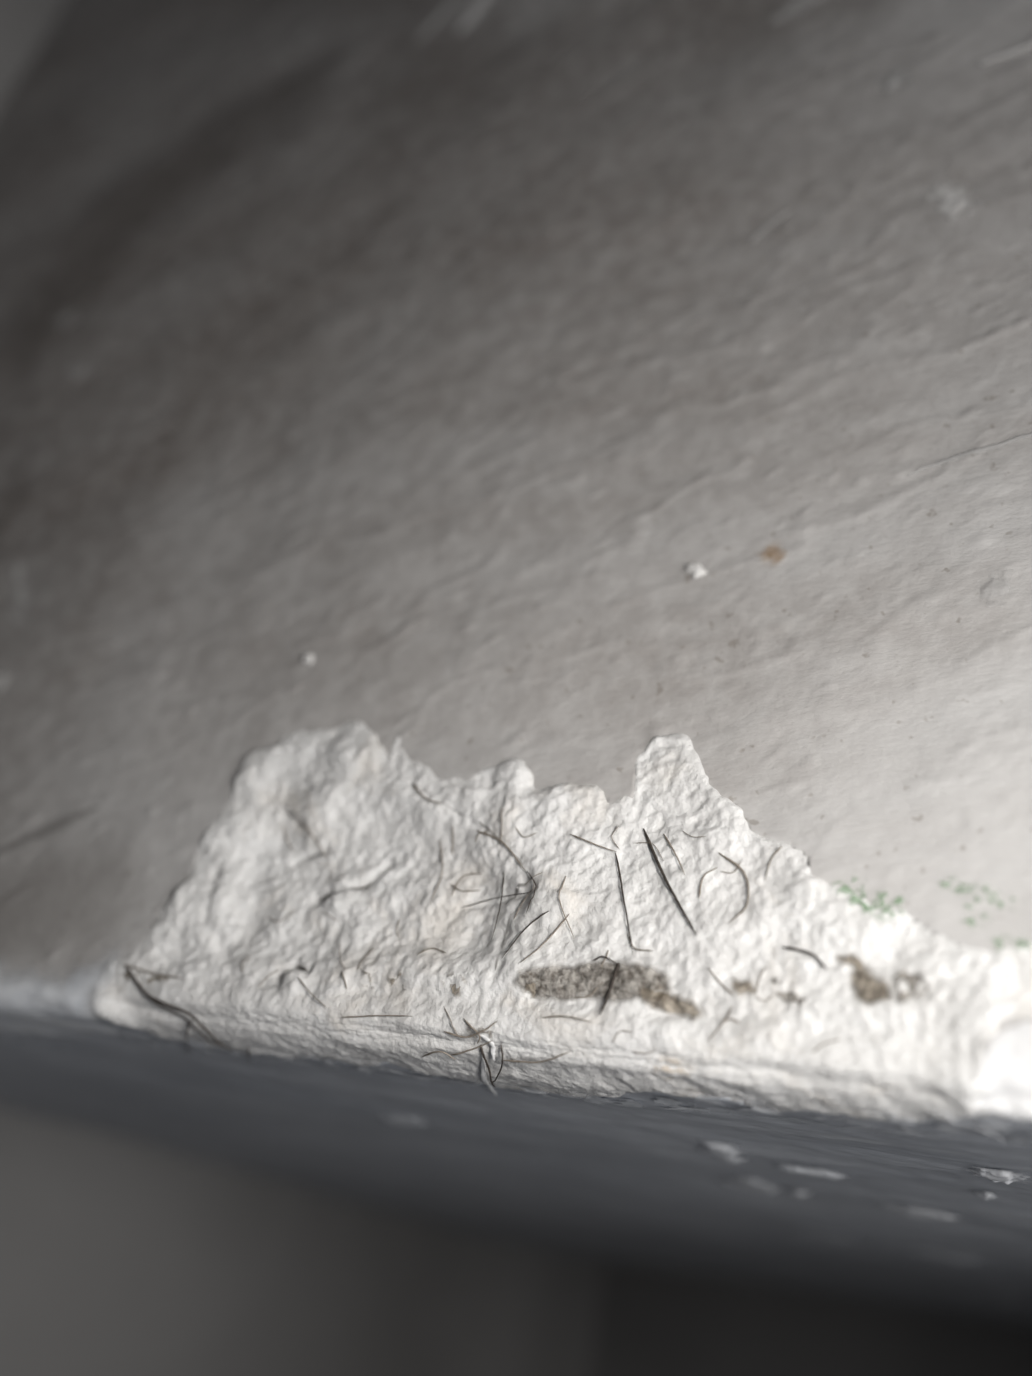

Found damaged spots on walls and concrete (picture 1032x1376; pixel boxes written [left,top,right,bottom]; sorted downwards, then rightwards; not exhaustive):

flaking render [0,721,1032,1145]